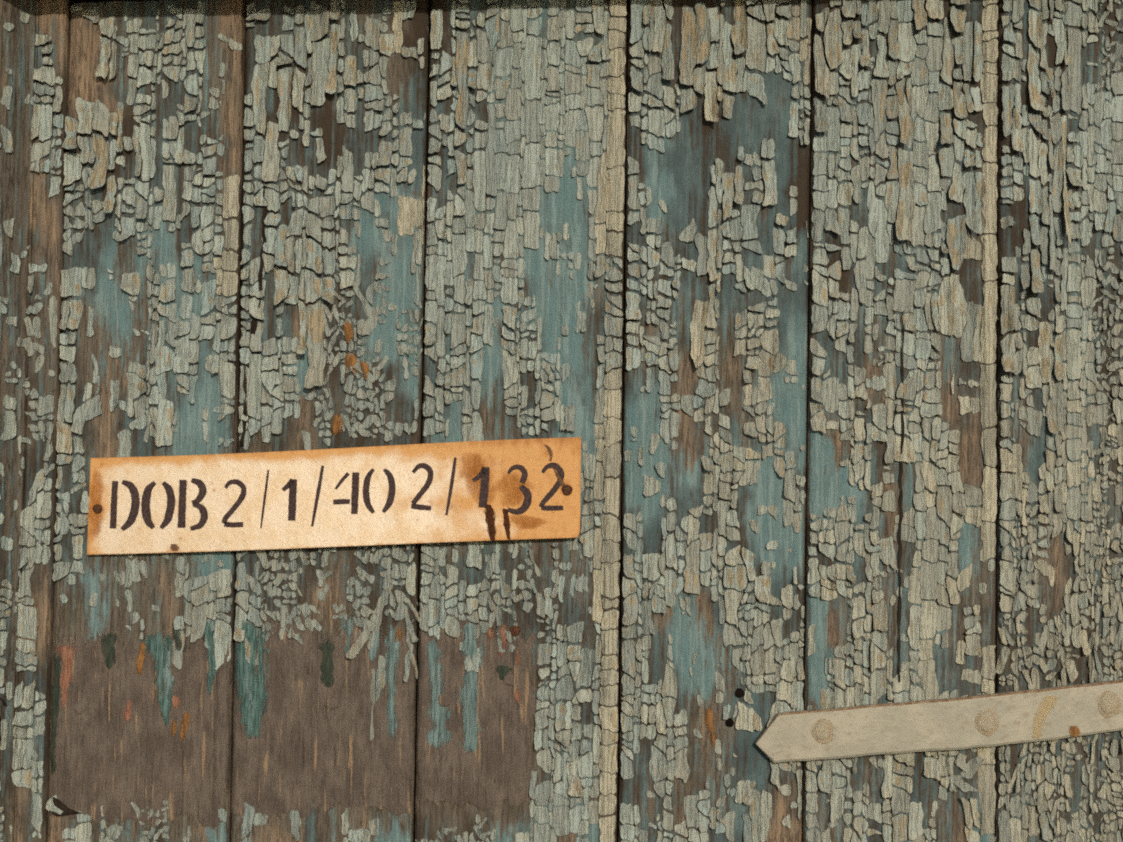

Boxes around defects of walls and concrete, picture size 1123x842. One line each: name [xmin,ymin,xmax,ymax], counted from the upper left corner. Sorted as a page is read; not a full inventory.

peeling [3,12,30,31]
peeling [1,68,13,110]
peeling [0,125,13,153]
peeling [3,218,15,238]
rust [343,321,370,380]
peeling [628,0,1123,709]
rust [332,414,343,435]
peeling [24,0,815,842]
rust [544,444,565,486]
rust [465,461,540,541]
peeling [0,246,123,842]
peeling [769,730,1123,842]